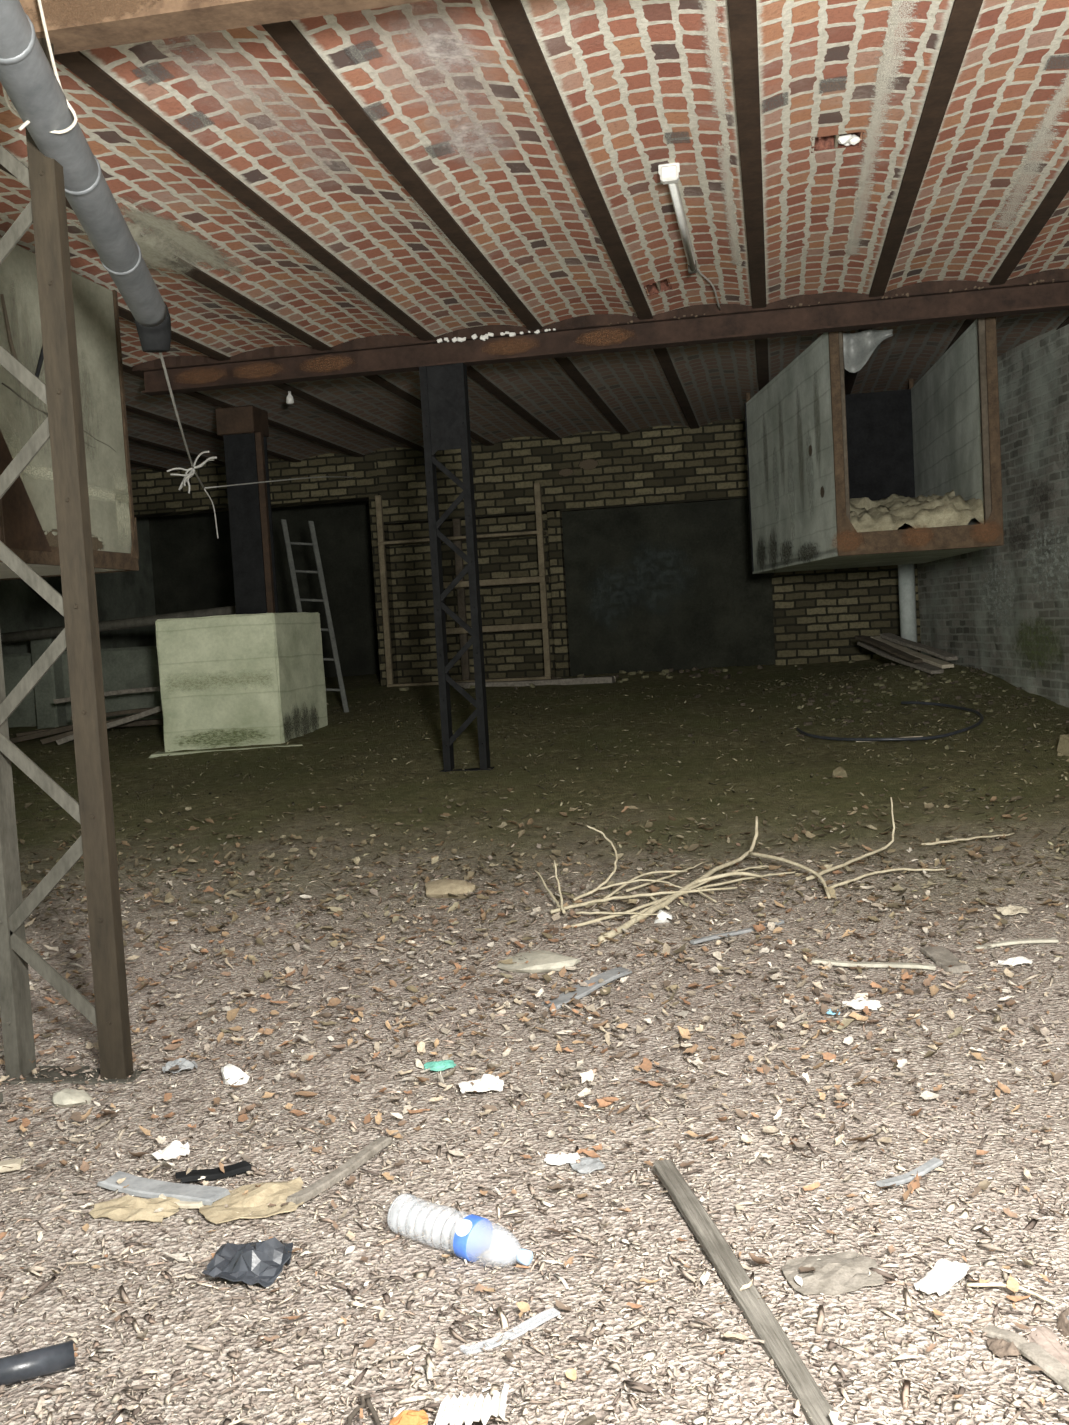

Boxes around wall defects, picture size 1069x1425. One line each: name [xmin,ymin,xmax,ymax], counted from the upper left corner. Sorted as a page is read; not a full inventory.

leakage [847,0,919,255]